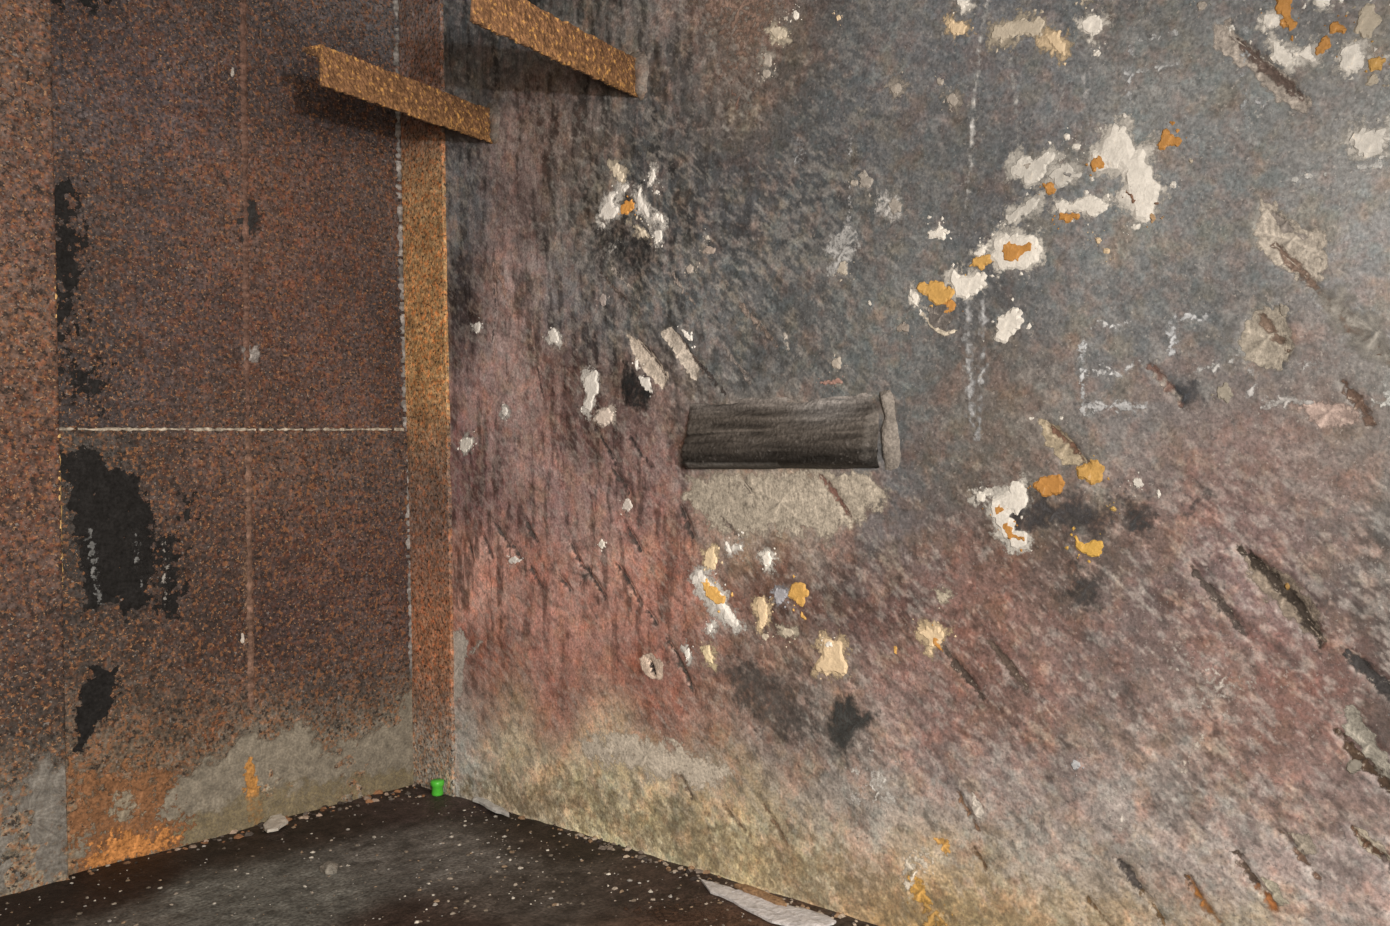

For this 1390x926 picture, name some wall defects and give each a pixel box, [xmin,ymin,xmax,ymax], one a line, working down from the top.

spalling [1189,0,1390,113]
peeling [595,159,716,310]
peeling [893,113,1193,337]
spalling [580,326,726,428]
peeling [983,298,1032,344]
peeling [967,416,1161,555]
rust [236,536,256,656]
spalling [612,468,891,692]
rust [66,742,197,873]
water stain [460,726,1092,926]
water stain [1174,649,1256,723]
spalling [1333,705,1390,793]